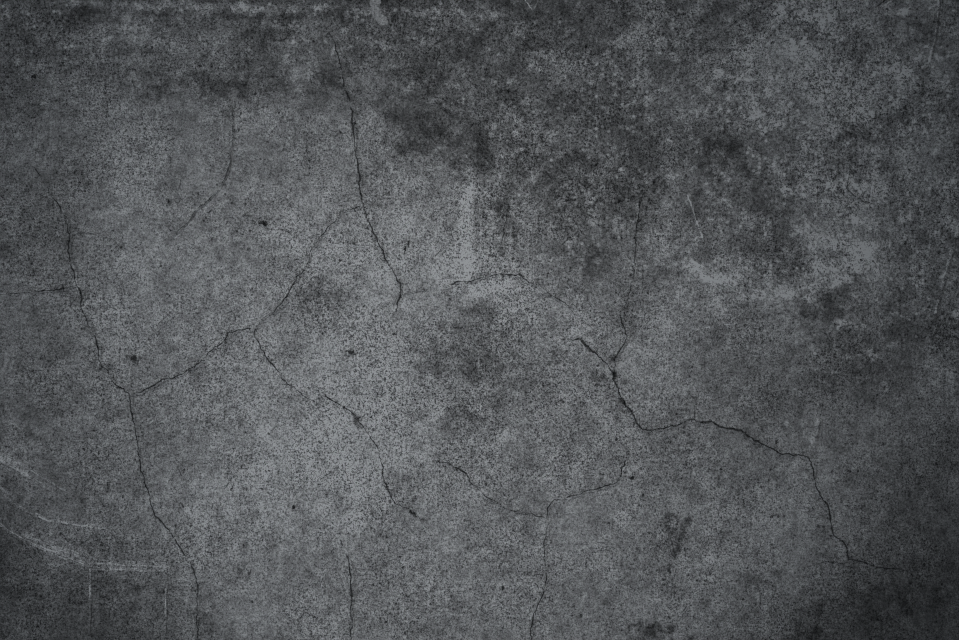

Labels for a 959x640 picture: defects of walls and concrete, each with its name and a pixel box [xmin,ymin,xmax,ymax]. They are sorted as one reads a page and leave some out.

crack [0,12,579,640]
crack [432,184,913,640]
crack [842,151,881,212]